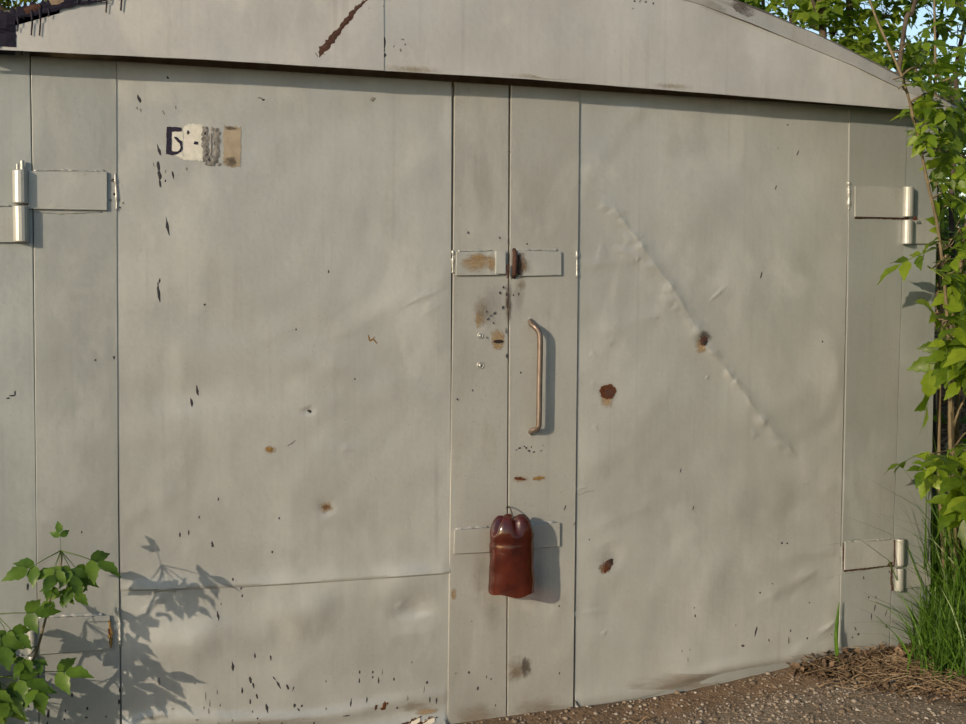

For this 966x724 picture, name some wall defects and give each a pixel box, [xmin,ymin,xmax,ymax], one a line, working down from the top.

rust [506,255,526,320]